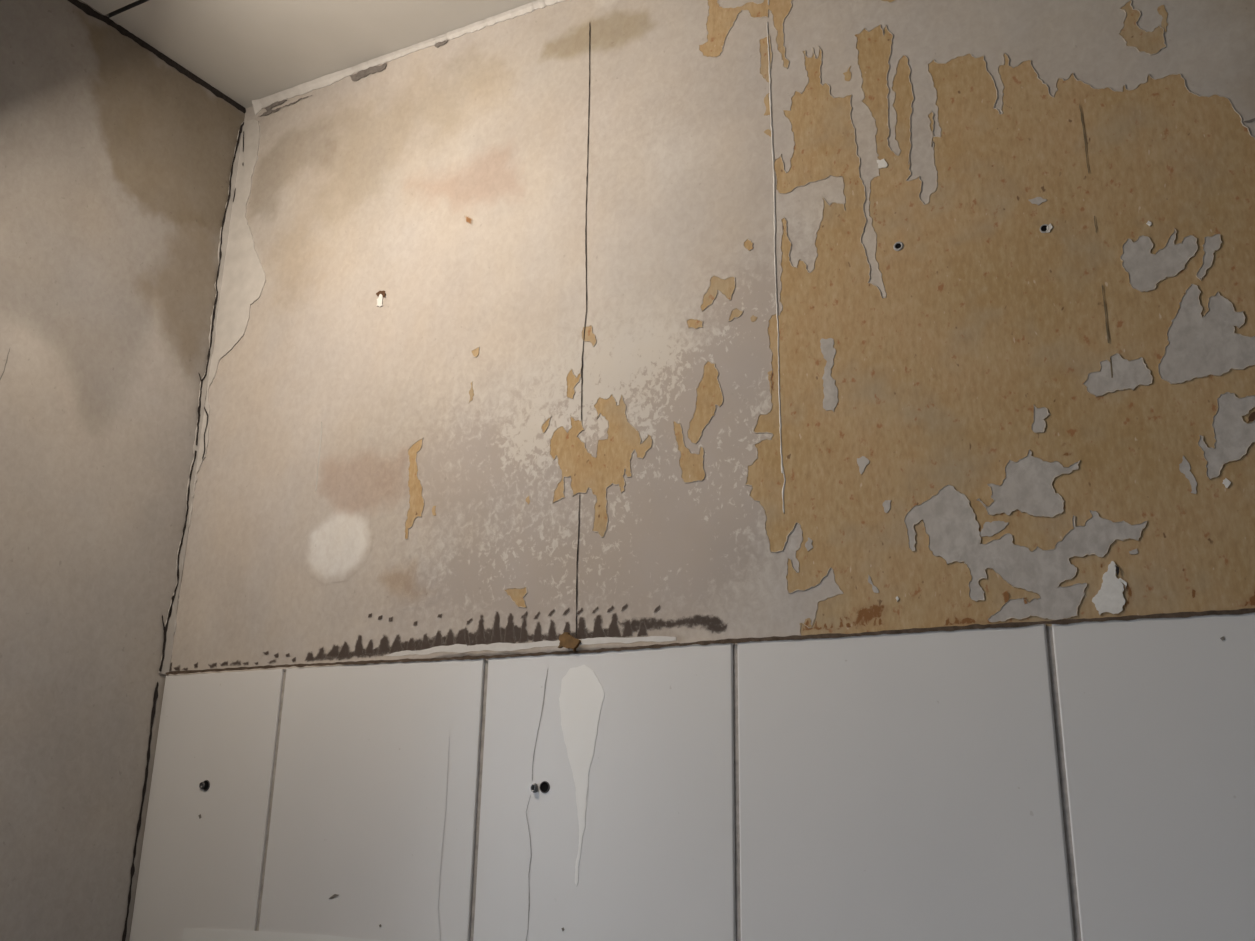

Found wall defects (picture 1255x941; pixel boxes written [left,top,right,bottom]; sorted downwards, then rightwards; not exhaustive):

damp [53,0,246,387]
damp [246,2,662,328]
peeling [404,438,436,539]
peeling [566,367,582,399]
peeling [581,325,597,347]
peeling [541,394,652,537]
peeling [673,361,724,483]
peeling [687,0,1255,636]